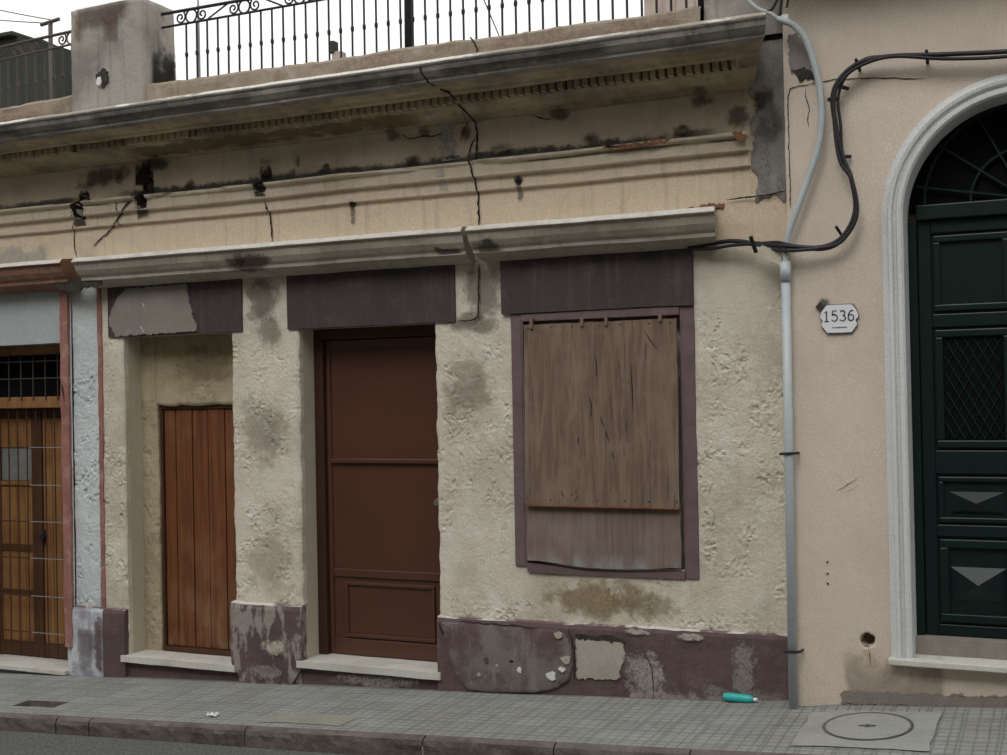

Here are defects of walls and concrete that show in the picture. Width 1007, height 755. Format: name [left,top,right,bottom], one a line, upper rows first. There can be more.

damp [135,115,409,157]
damp [130,124,700,196]
crack [402,66,480,225]
hole [70,191,90,227]
crack [72,201,130,256]
hole [131,171,154,218]
crack [264,201,273,238]
peeling [109,283,197,337]
crack [458,263,480,322]
peeling [78,617,102,671]
peeling [262,640,285,655]
peeling [546,628,724,701]